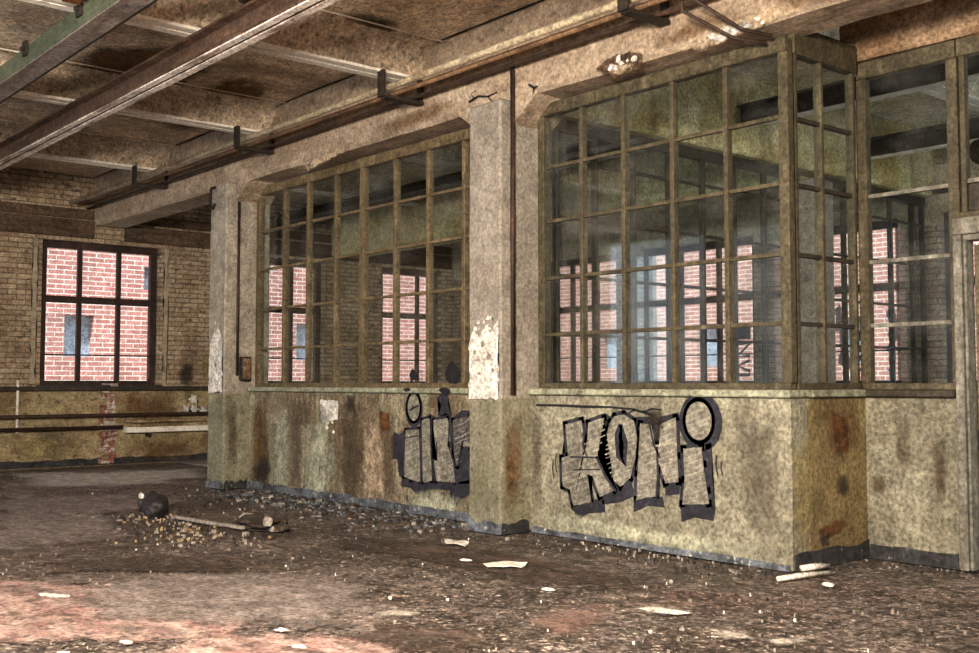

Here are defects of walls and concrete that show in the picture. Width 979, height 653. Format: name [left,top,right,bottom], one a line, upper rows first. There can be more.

peeling [468,316,499,400]
leakage [275,418,287,485]
leakage [308,397,385,498]
rust [830,413,852,451]